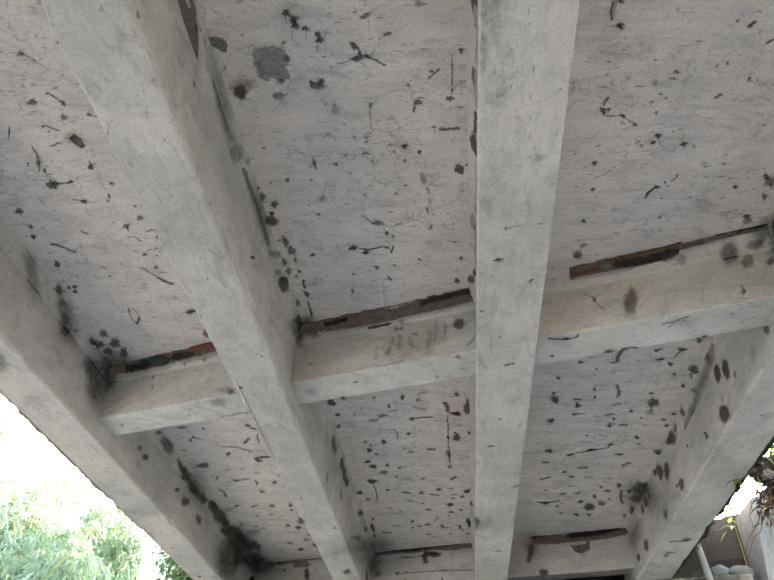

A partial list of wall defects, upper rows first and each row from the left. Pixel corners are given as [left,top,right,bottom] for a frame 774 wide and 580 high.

peeling [469,0,477,29]
peeling [469,40,477,158]
spalling [569,224,768,281]
spalling [300,287,474,336]
spalling [109,342,219,378]
spalling [531,527,628,546]